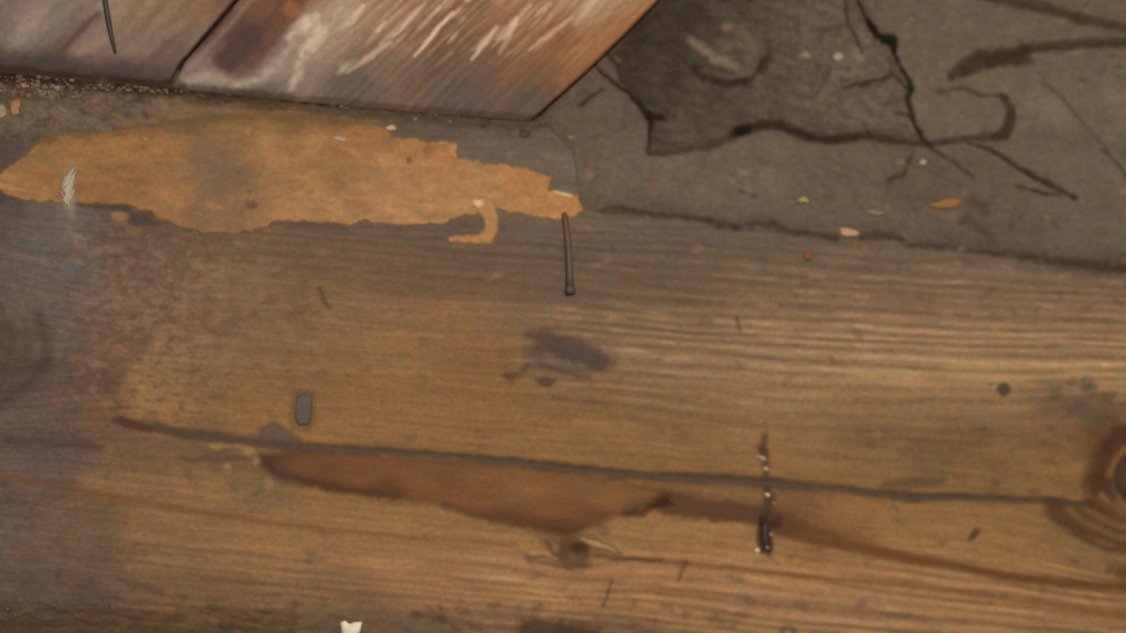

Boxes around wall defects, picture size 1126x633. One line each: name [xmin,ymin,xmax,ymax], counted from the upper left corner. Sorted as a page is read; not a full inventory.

crack [580,0,1126,199]
peeling [0,114,583,244]
leakage [536,333,606,368]
crack [116,419,1091,506]
leakage [261,452,1126,590]